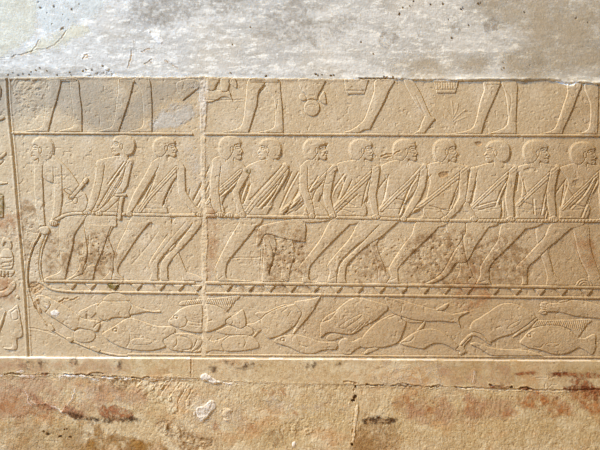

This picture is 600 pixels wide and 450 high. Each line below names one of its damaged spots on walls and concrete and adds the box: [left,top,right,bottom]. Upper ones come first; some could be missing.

crack [0,358,198,413]
crack [344,367,591,402]